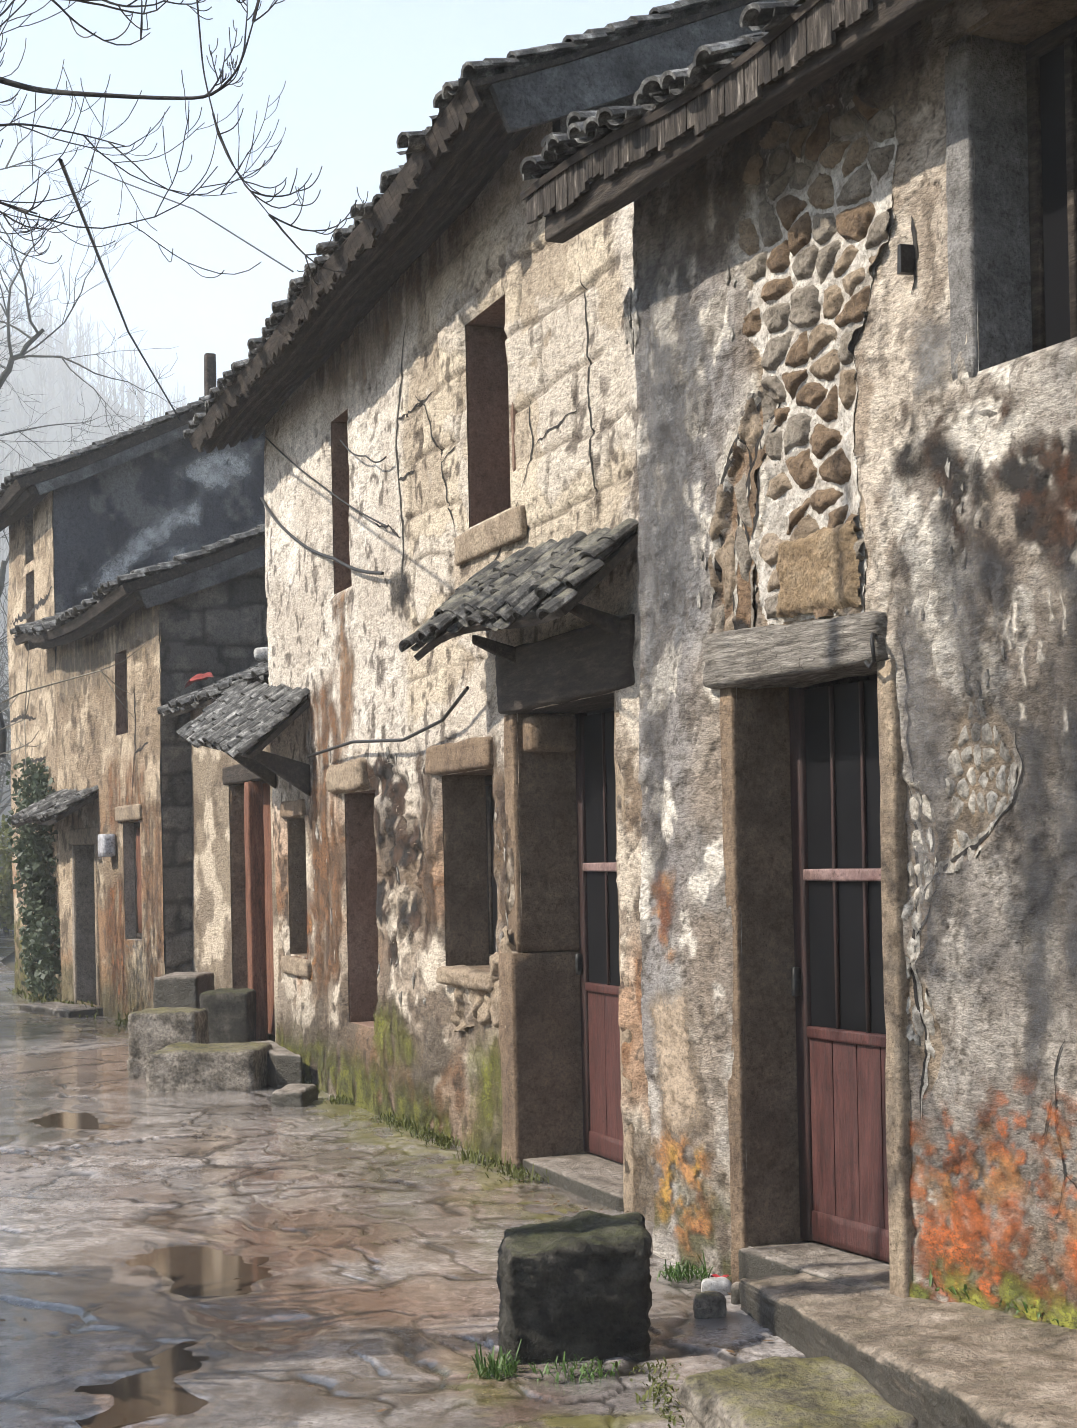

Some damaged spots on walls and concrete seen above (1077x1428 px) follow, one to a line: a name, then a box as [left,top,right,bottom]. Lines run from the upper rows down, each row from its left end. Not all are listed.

crack [374,319,456,600]
crack [516,264,598,520]
peeling [623,251,641,355]
spalling [697,93,898,633]
damp [915,319,951,391]
damp [894,409,1077,725]
damp [991,391,1012,426]
damp [900,615,952,938]
crack [899,639,1024,1120]
damp [1016,704,1077,1097]
rust [656,1128,710,1250]
rust [911,1104,1077,1316]